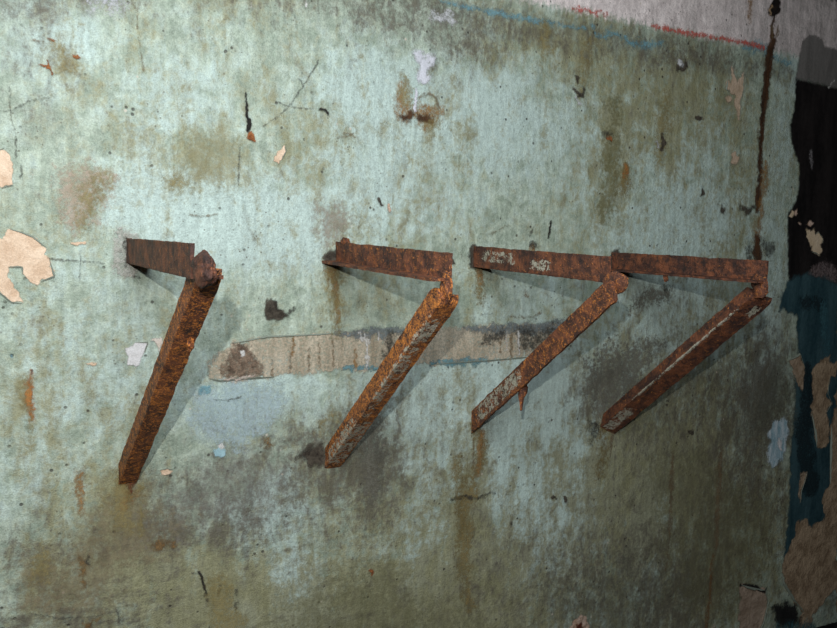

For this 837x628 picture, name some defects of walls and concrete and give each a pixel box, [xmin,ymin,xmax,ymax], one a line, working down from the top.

peeling [0,148,13,188]
damp [599,98,620,221]
corrosion [745,16,779,260]
peeling [789,210,823,255]
peeling [0,229,55,304]
spalling [264,298,294,320]
corrosion [325,265,344,323]
spalling [211,332,346,382]
peeling [780,353,837,628]